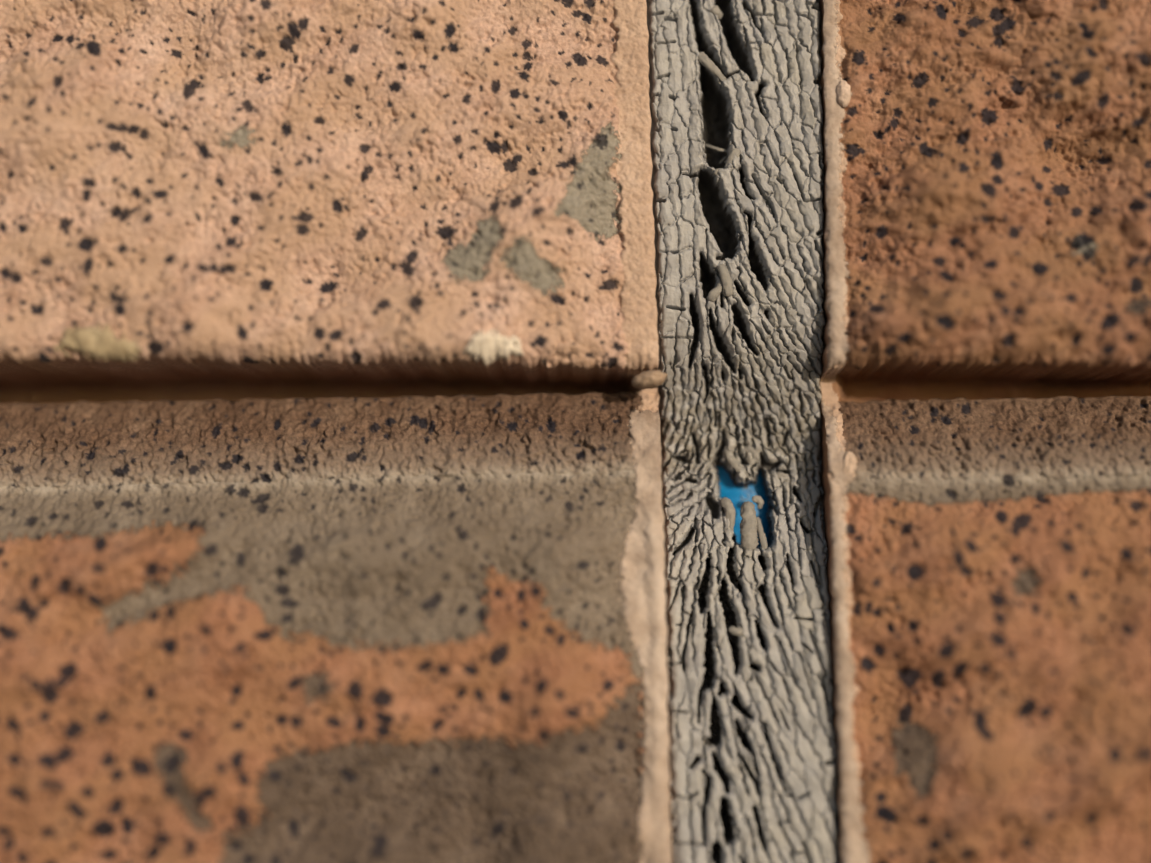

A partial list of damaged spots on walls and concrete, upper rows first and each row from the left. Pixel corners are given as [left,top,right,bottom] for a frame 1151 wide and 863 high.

crack [682,0,769,404]
crack [672,527,786,863]